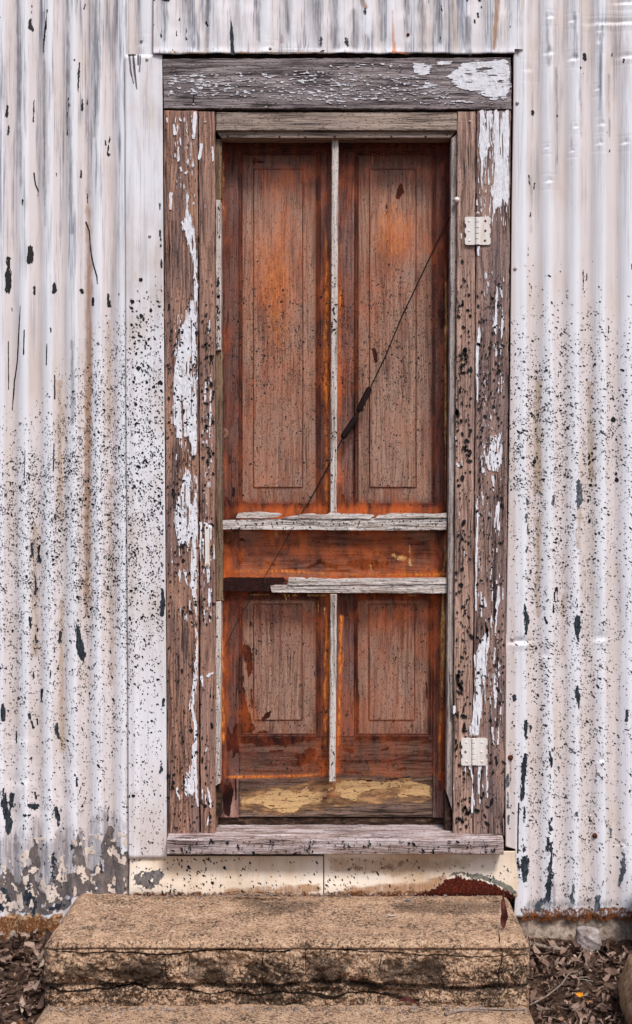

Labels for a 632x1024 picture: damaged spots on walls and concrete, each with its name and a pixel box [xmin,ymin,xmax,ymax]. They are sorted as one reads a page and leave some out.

peeling [167,59,511,237]
peeling [484,271,504,357]
peeling [158,111,432,826]
peeling [464,327,516,745]
peeling [464,765,488,813]
peeling [505,753,528,825]
peeling [0,788,164,917]
peeling [534,817,554,912]
peeling [618,852,626,887]
rust [0,913,63,940]
crack [50,932,524,1001]
rust [521,907,632,923]